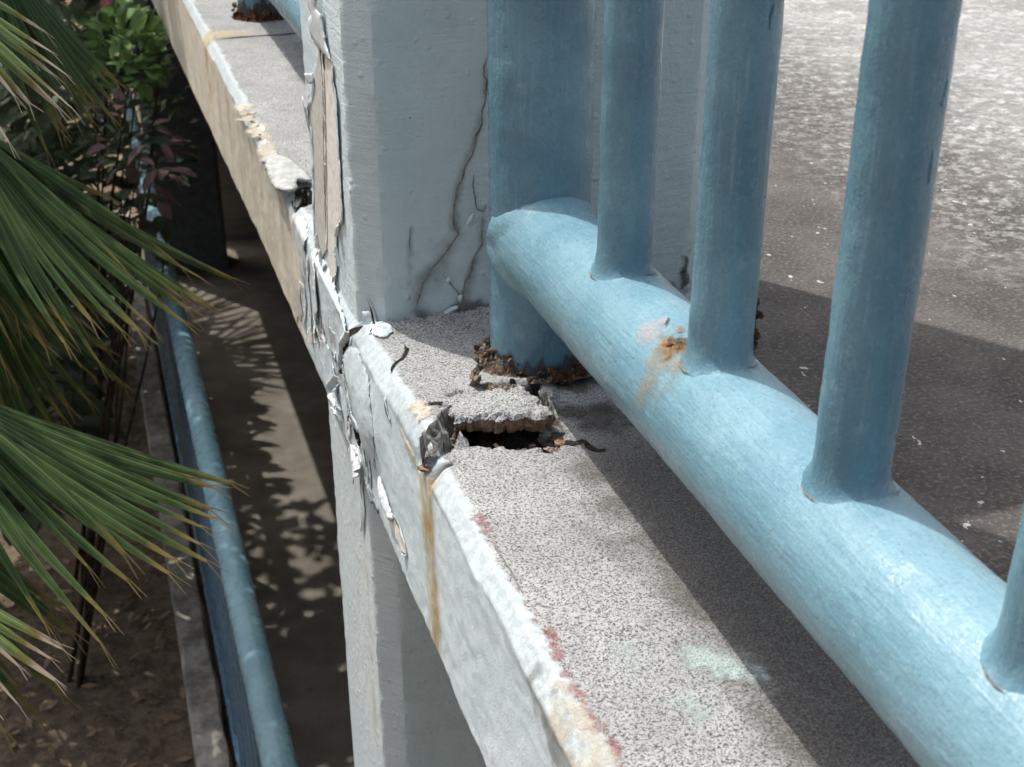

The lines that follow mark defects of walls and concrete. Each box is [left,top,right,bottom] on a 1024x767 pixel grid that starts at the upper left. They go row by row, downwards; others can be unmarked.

peeling [261,0,350,365]
crack [414,57,488,315]
corrosion [468,336,600,397]
corrosion [641,327,687,391]
spalling [401,379,565,472]
peeling [327,388,407,557]
corrosion [420,482,434,546]